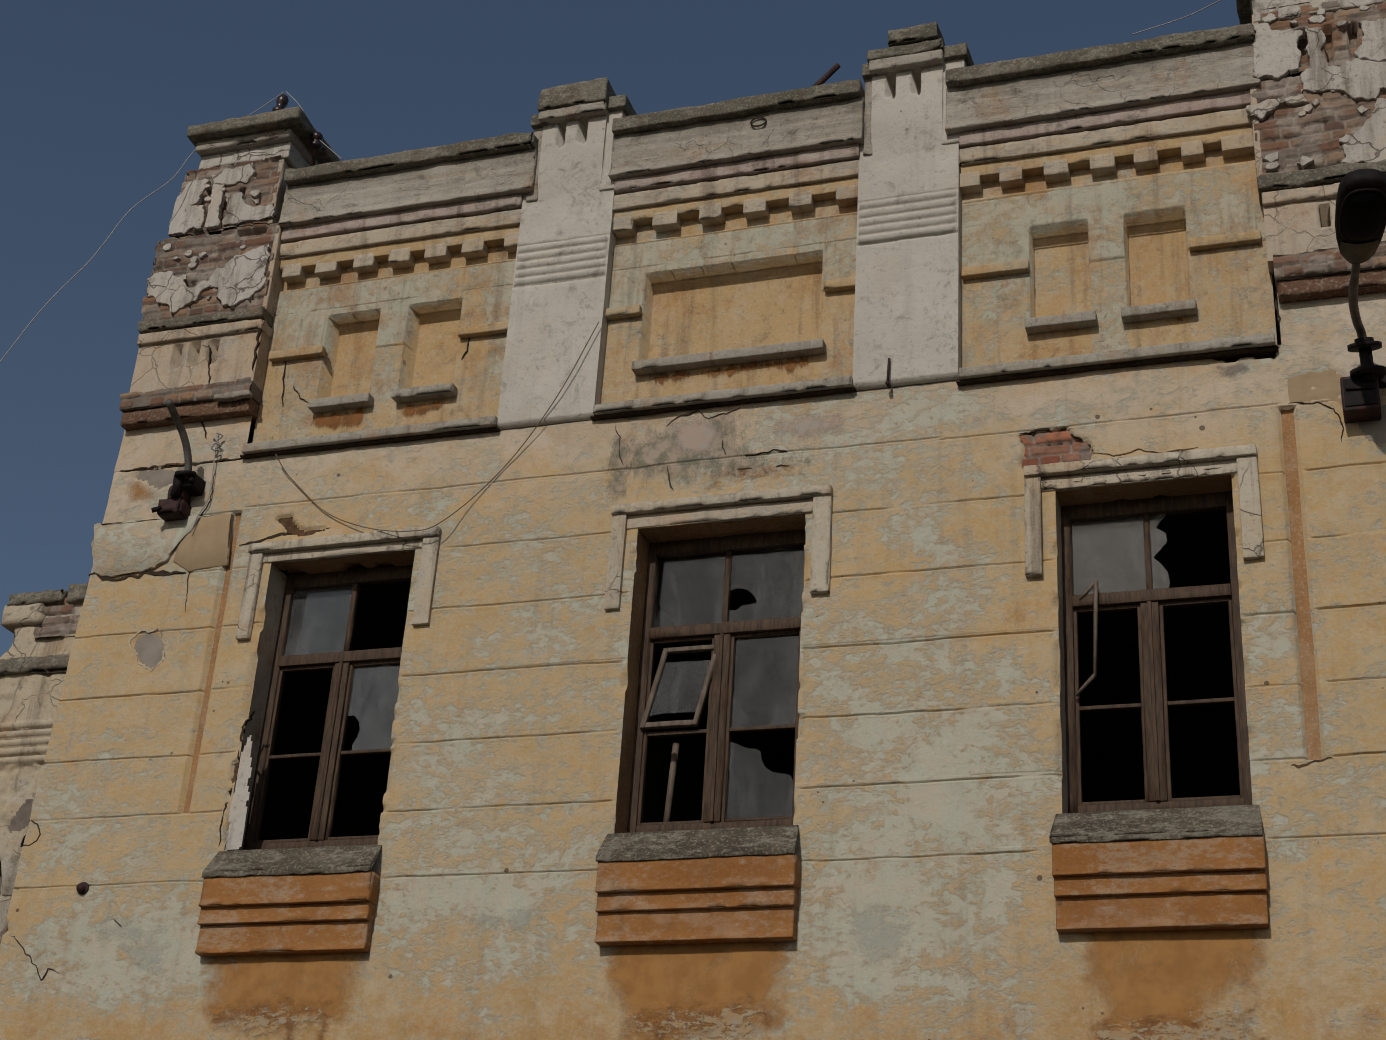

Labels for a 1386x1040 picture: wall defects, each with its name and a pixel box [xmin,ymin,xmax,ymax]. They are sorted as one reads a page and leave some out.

flaking render [1246,0,1386,175]
flaking render [141,155,282,321]
flaking render [1020,427,1093,468]
flaking render [278,517,322,537]
flaking render [8,799,33,833]
flaking render [224,735,252,851]
peeling [0,860,19,944]
crack [12,936,58,981]